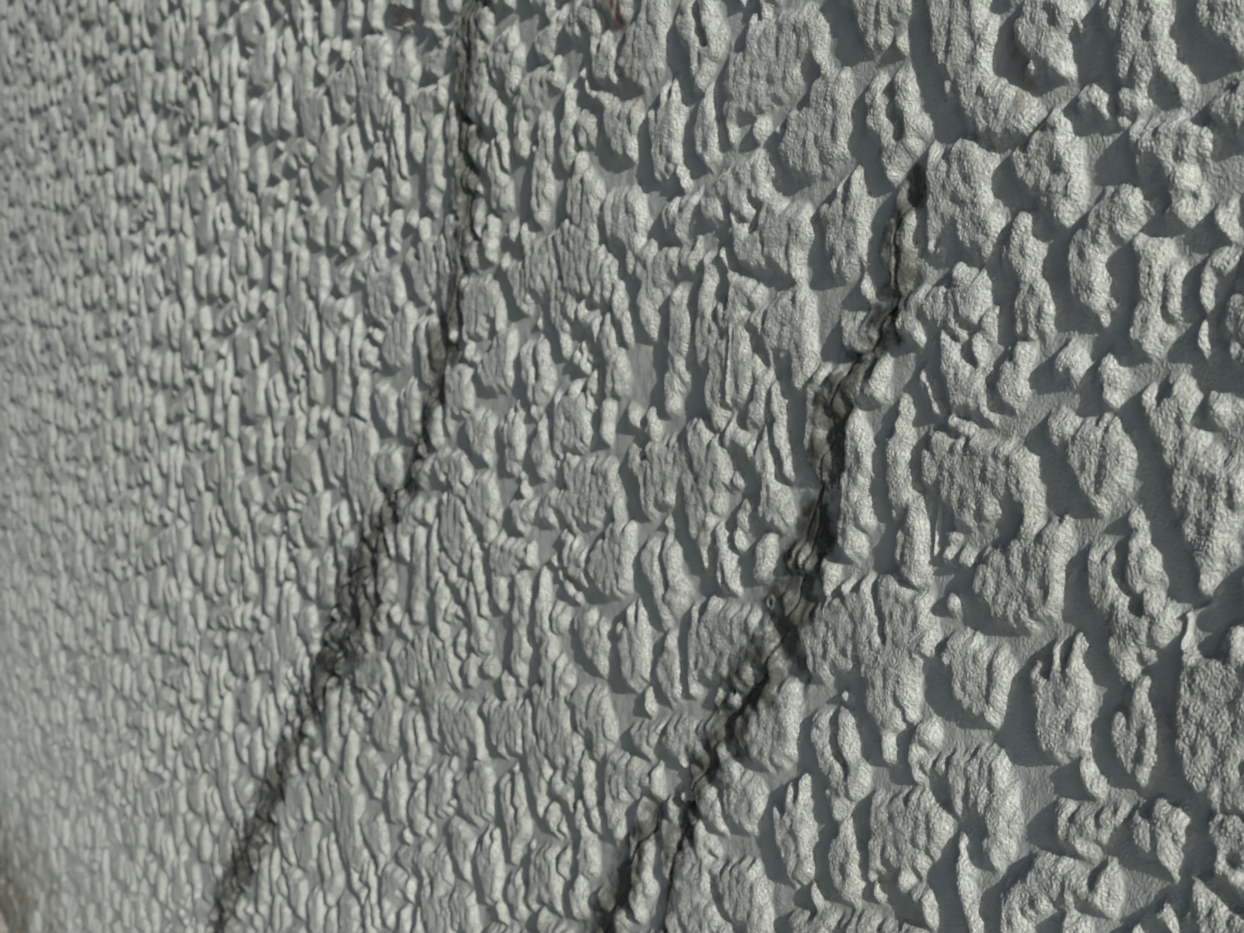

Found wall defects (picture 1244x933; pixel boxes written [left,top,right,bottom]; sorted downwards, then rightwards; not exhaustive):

crack [454,229,466,306]
crack [845,220,902,377]
crack [391,358,446,519]
crack [794,435,837,577]
crack [242,548,377,854]
crack [749,640,782,696]
crack [632,819,684,933]